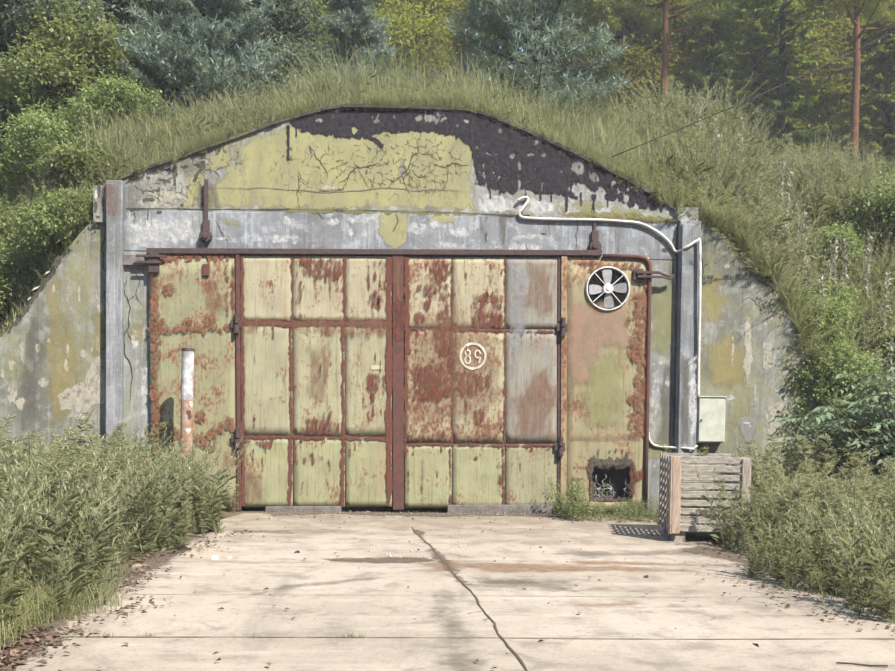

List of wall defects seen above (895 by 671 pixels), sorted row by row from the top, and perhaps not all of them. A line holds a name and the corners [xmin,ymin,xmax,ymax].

crack [126,132,530,243]
peeling [130,126,621,223]
peeling [0,338,50,410]
peeling [58,336,106,418]
crack [101,226,142,403]
rust [148,254,236,462]
rust [353,345,387,424]
rust [412,258,504,436]
rust [570,257,647,439]
damp [702,264,729,320]
damp [710,317,773,405]
crack [412,527,528,671]